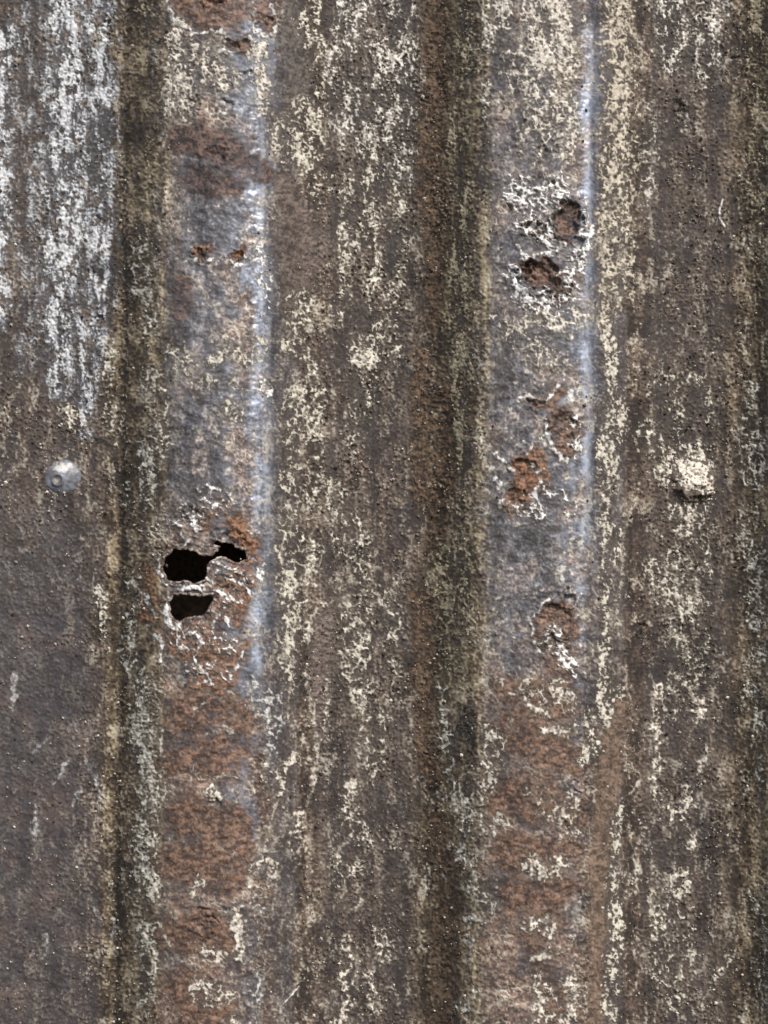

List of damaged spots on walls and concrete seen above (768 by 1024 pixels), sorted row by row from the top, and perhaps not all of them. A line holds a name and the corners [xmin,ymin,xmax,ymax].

rust [231,243,247,261]
rust [514,257,573,304]
rust [522,200,580,242]
rust [502,383,585,517]
rust [137,496,262,778]
rust [149,795,254,896]
rust [485,597,587,1024]
rust [155,905,235,1024]